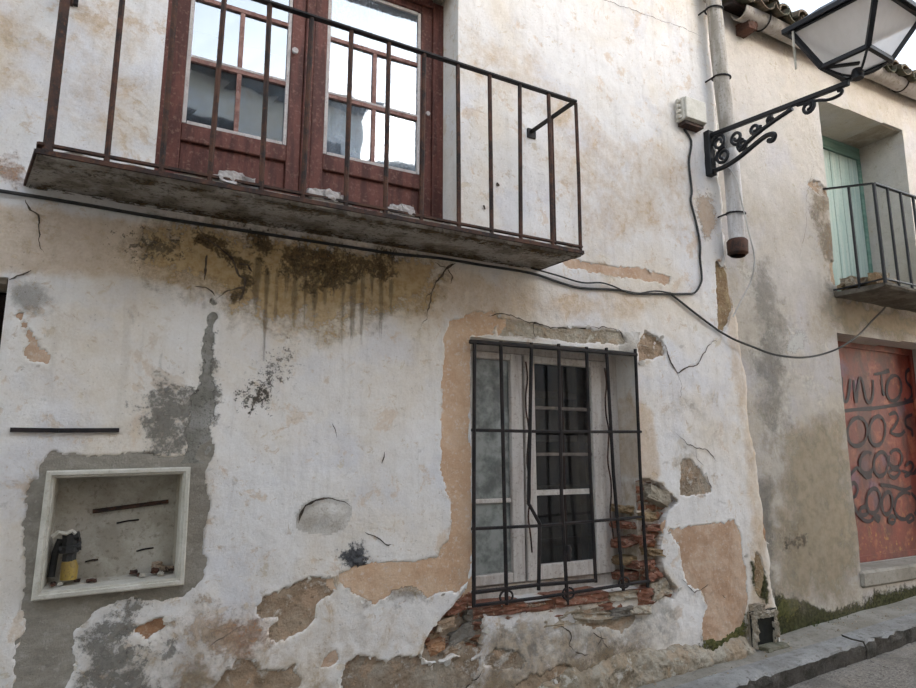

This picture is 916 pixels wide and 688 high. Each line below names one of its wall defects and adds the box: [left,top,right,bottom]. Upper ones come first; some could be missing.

leakage [29,160,578,342]
crack [423,262,455,322]
peeling [562,259,670,286]
flaking render [715,262,732,332]
peeling [16,313,51,367]
leakage [126,332,222,458]
leakage [234,337,301,416]
flaking render [637,333,664,366]
crack [665,340,716,398]
flaking render [673,459,711,502]
peeling [660,520,764,641]
flaking render [321,644,569,688]